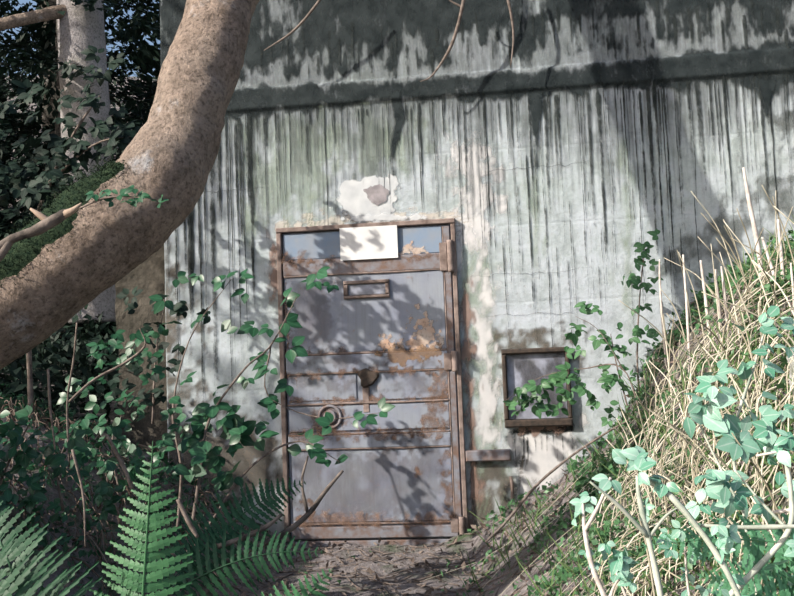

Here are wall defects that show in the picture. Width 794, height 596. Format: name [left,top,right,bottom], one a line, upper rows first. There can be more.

leakage [160,0,186,66]
peeling [337,173,427,223]
leakage [167,0,794,443]
corrosion [460,293,477,362]
corrosion [463,374,476,450]
corrosion [519,426,563,437]
leakage [507,415,586,496]
corrosion [404,472,456,530]